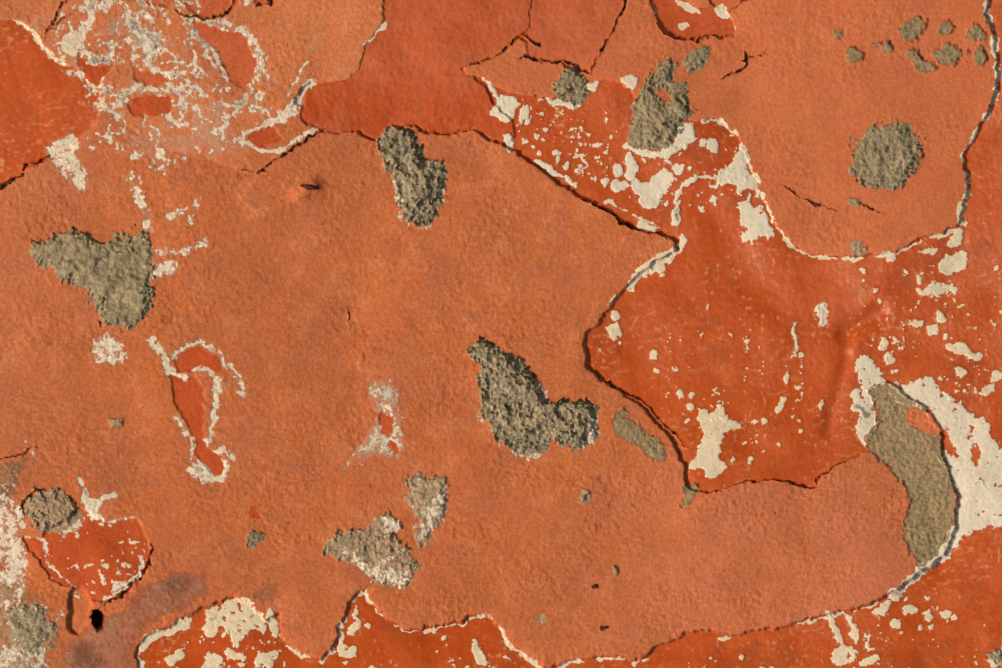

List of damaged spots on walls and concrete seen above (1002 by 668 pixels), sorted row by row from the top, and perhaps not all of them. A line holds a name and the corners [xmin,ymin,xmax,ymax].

crack [469,0,627,74]
crack [0,155,50,190]
crack [241,130,323,174]
peeling [569,126,609,181]
peeling [601,152,685,209]
crack [581,199,659,235]
peeling [736,193,775,245]
peeling [916,250,968,308]
peeling [775,322,804,433]
peeling [902,309,1002,396]
crack [733,459,849,489]
peeling [201,647,247,668]